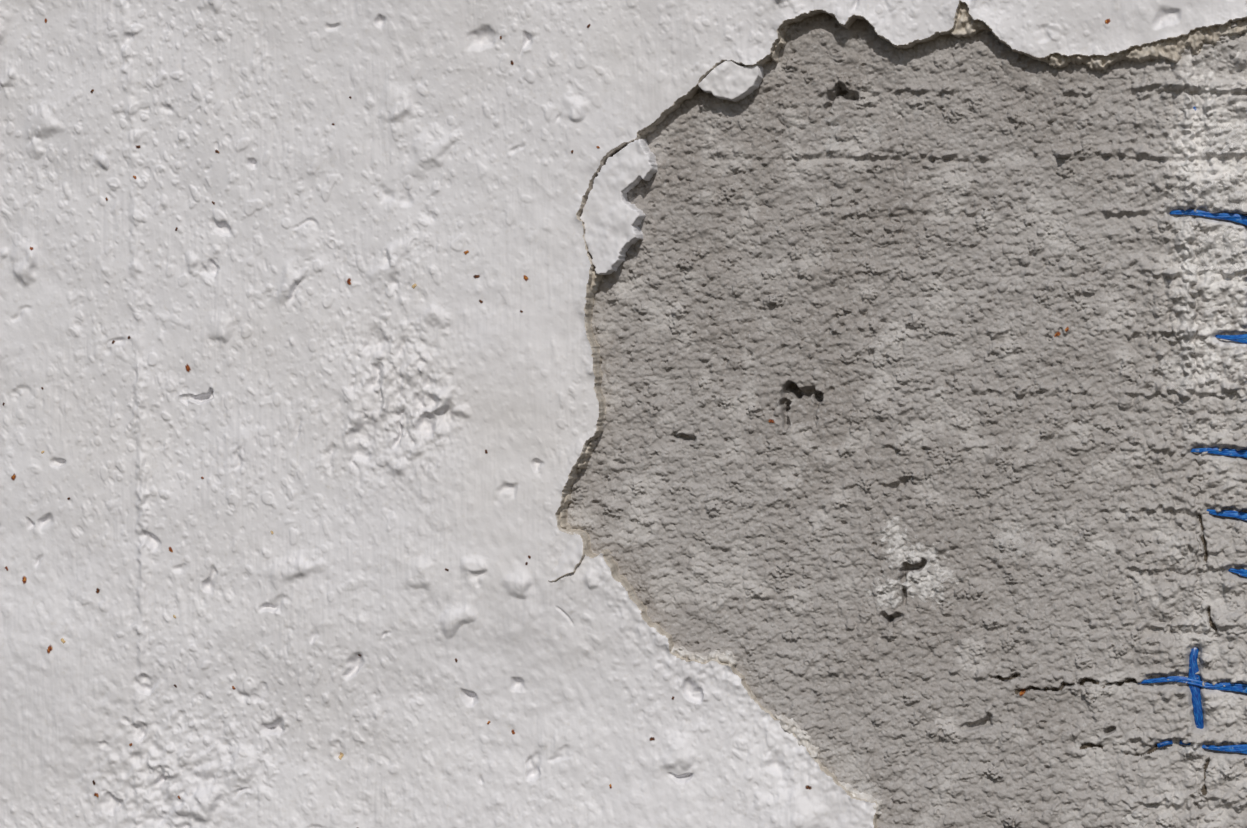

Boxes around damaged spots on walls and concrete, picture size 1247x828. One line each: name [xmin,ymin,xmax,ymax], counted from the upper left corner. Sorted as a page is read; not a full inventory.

peeling [548,0,1247,828]
crack [990,674,1137,695]
crack [1080,743,1158,757]